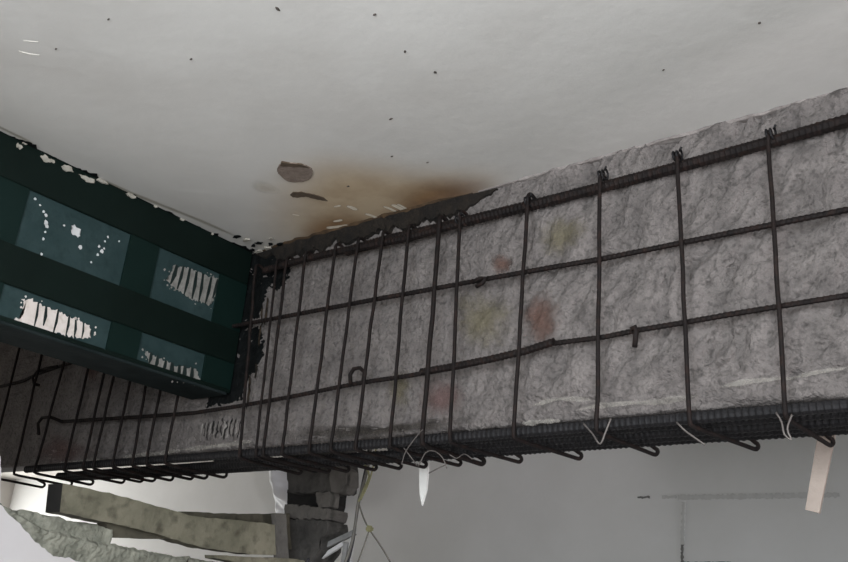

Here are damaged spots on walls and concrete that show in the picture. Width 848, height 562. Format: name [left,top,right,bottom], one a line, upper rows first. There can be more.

flaking render [40,154,108,185]
spalling [233,113,848,273]
flaking render [14,296,97,339]
flaking render [163,265,218,309]
spalling [62,292,848,423]
spalling [232,207,848,328]